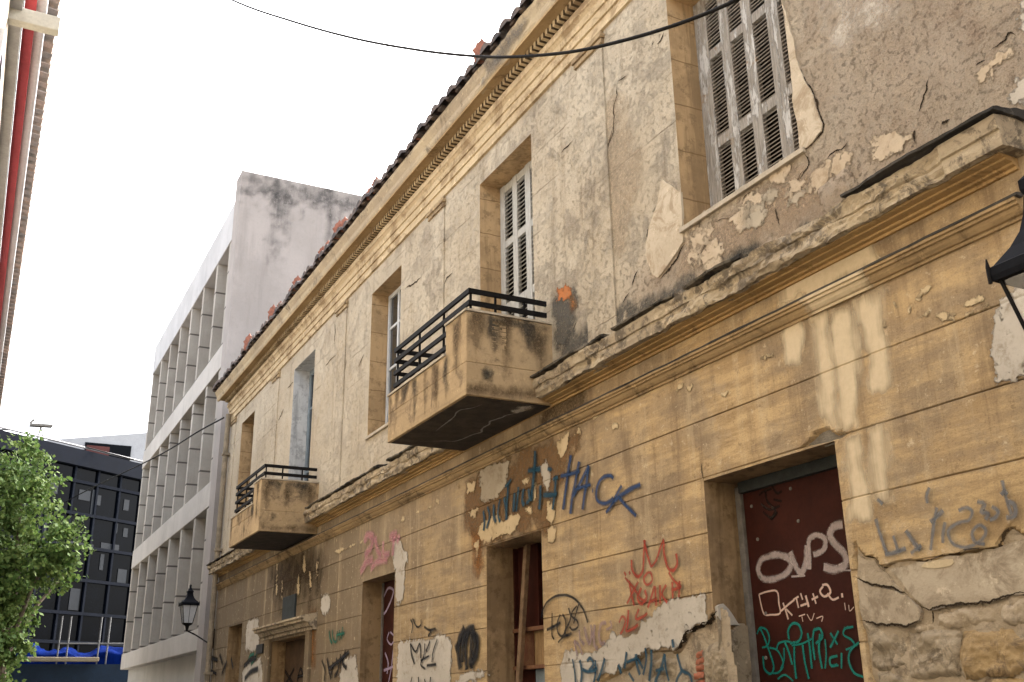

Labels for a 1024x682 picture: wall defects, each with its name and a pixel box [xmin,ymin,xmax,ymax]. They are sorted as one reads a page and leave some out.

crack [608,76,626,146]
peeling [781,0,823,149]
peeling [974,41,1024,85]
peeling [1015,0,1024,31]
peeling [646,118,914,278]
crack [450,412,520,442]
water stain [468,385,535,413]
water stain [433,290,588,397]
water stain [780,245,891,522]
peeling [457,428,581,562]
spalling [605,604,752,682]
spalling [856,529,1024,682]